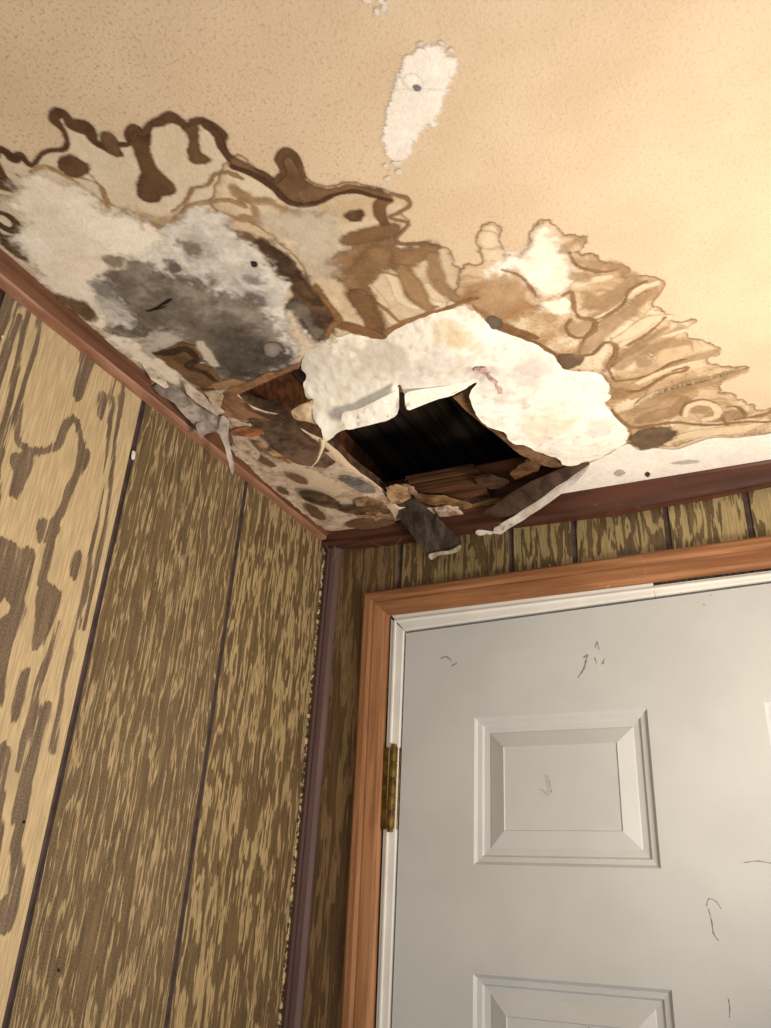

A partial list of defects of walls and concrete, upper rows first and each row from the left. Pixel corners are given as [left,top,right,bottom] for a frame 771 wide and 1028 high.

water stain [0,108,771,450]
peeling [2,172,771,531]
peeling [381,41,458,181]